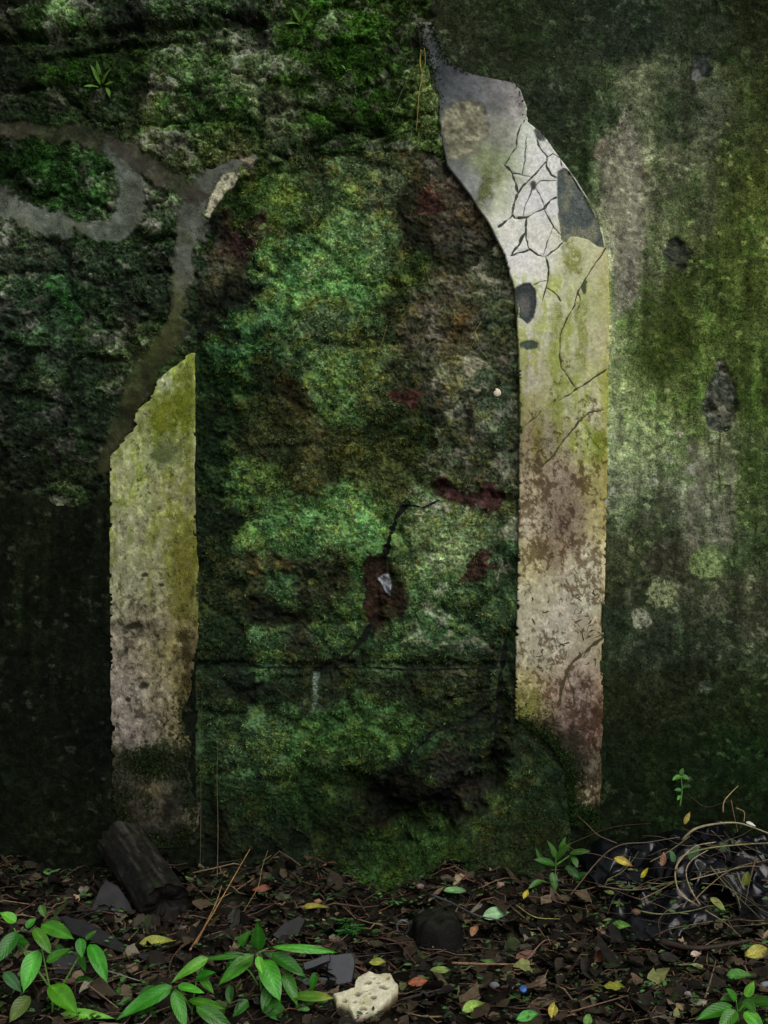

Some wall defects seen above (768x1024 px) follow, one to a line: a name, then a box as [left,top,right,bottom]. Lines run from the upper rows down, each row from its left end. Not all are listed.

flaking render [557,106,651,324]
spalling [663,238,691,270]
spalling [515,283,536,324]
crack [497,124,607,467]
spalling [519,340,538,350]
spalling [702,359,739,432]
spalling [434,475,508,518]
crack [382,500,439,560]
spalling [458,549,498,584]